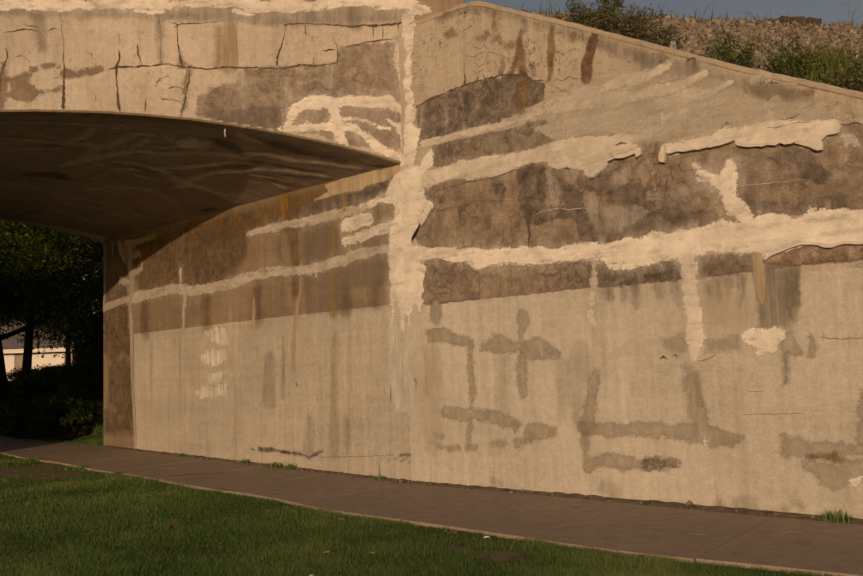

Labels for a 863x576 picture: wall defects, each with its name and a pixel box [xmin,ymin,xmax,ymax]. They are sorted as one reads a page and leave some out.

crack [0,18,70,109]
crack [86,21,402,116]
crack [415,14,601,108]
corrosion [503,29,527,114]
corrosion [547,26,555,81]
corrosion [581,33,597,85]
spalling [411,60,863,250]
damp [179,268,187,330]
spalling [422,259,680,305]
damp [597,252,816,382]
damp [426,300,560,451]
damp [577,364,744,473]